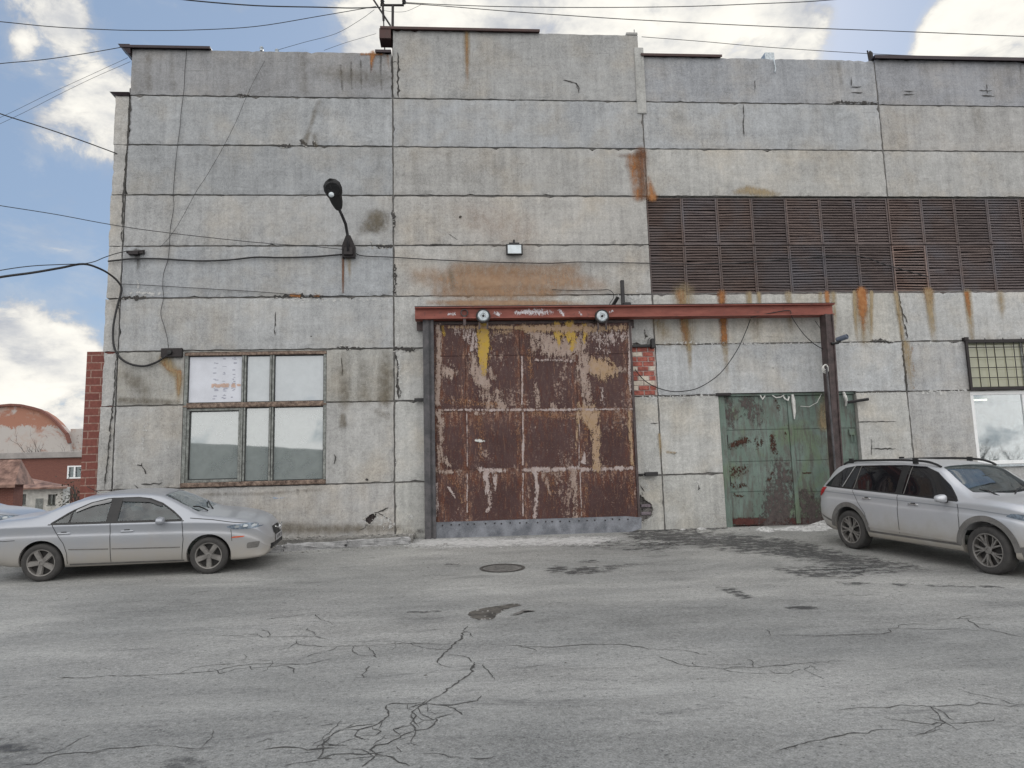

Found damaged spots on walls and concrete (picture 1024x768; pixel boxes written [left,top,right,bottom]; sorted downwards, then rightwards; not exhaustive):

corrosion [629,148,656,201]
leakage [365,212,383,230]
corrosion [853,287,873,335]
corrosion [925,289,935,329]
corrosion [964,291,973,328]
corrosion [680,319,691,362]
peeling [434,308,824,526]
spalling [363,513,395,529]
corrosion [732,517,809,526]
leakage [593,530,913,586]
crack [20,614,919,767]
crack [777,691,1023,751]